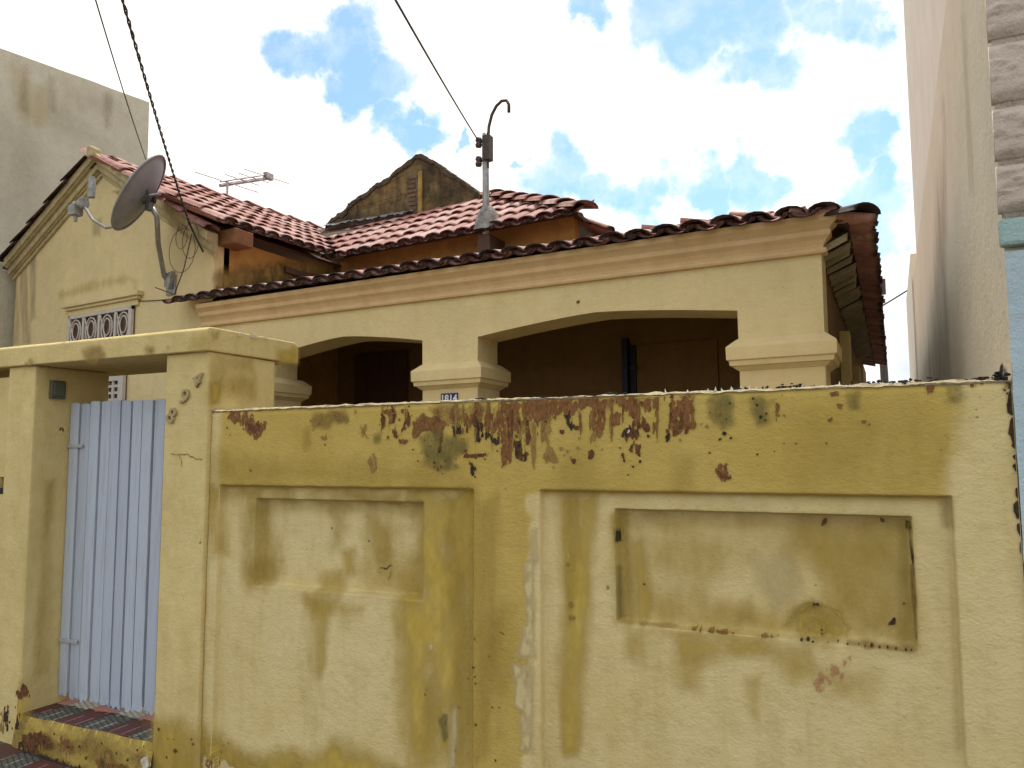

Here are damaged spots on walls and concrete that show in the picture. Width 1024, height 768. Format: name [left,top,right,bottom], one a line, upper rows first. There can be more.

peeling [226,411,266,440]
peeling [379,394,708,478]
spalling [715,463,731,482]
water stain [562,496,595,754]
peeling [0,683,151,768]